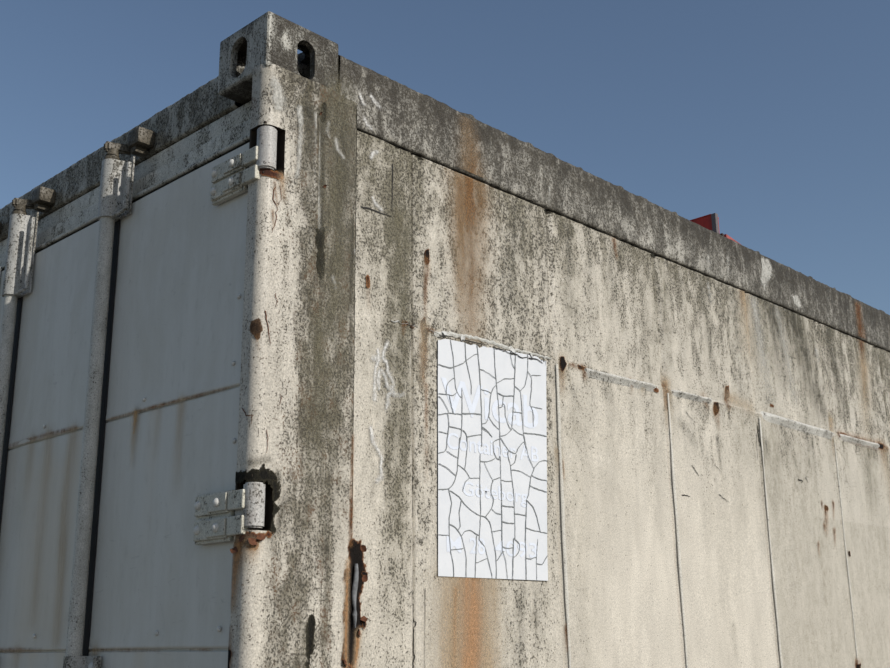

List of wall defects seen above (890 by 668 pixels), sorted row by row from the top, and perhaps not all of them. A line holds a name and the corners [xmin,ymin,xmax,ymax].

water stain [306,81,354,376]
corrosion [250,318,263,339]
water stain [752,258,817,371]
crack [370,320,548,580]
corrosion [230,531,272,603]
corrosion [443,577,493,668]